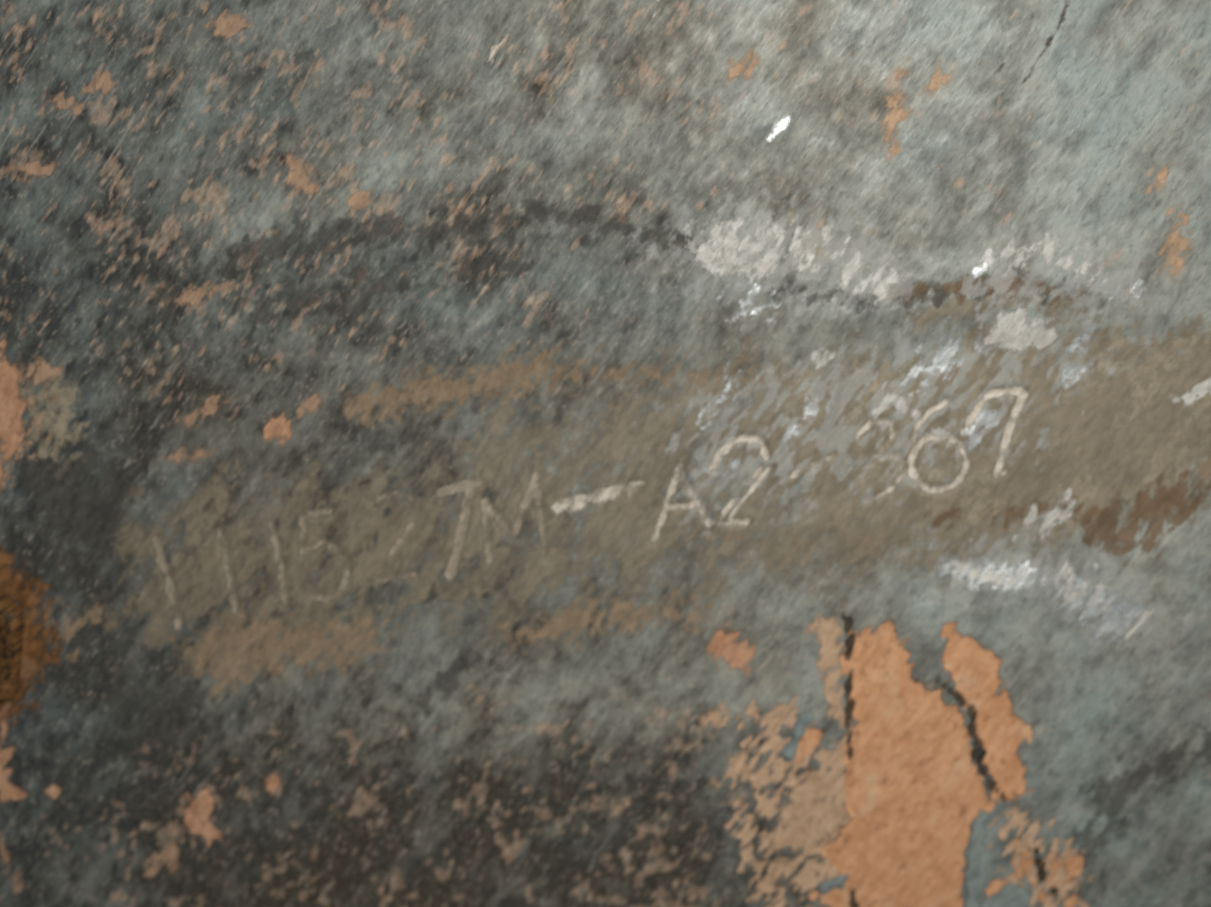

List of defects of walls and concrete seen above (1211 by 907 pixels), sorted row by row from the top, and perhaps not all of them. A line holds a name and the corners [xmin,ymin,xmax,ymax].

peeling [0,339,62,486]
rust [0,549,102,743]
peeling [699,617,1092,907]